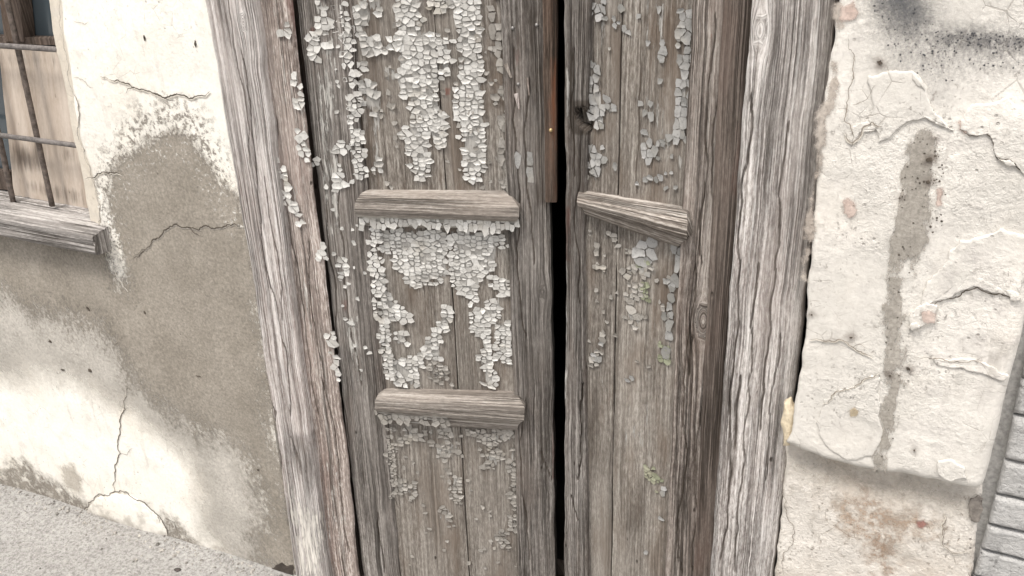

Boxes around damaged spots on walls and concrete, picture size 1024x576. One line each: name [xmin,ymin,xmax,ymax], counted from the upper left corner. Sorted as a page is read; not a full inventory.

crack [58,0,210,222]
flaking render [814,62,839,179]
crack [843,35,882,145]
peeling [850,70,1024,174]
crack [105,223,241,292]
flaking render [801,194,816,281]
water stain [872,128,946,471]
peeling [909,228,1024,330]
crack [935,287,1010,304]
crack [84,391,178,536]
peeling [816,375,883,460]
peeling [937,459,966,482]